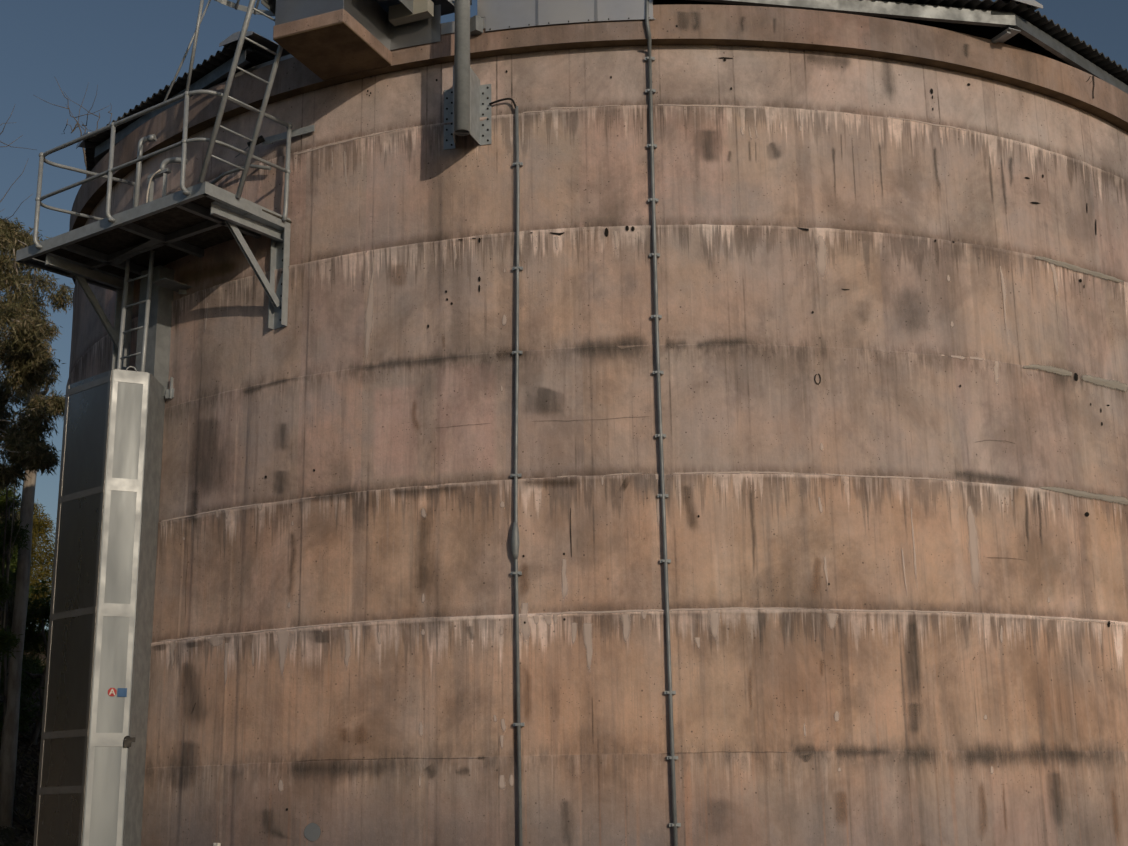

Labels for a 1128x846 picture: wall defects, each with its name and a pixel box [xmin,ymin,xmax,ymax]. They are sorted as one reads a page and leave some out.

damp [160,617,432,682]
damp [521,603,803,667]
damp [827,609,984,629]